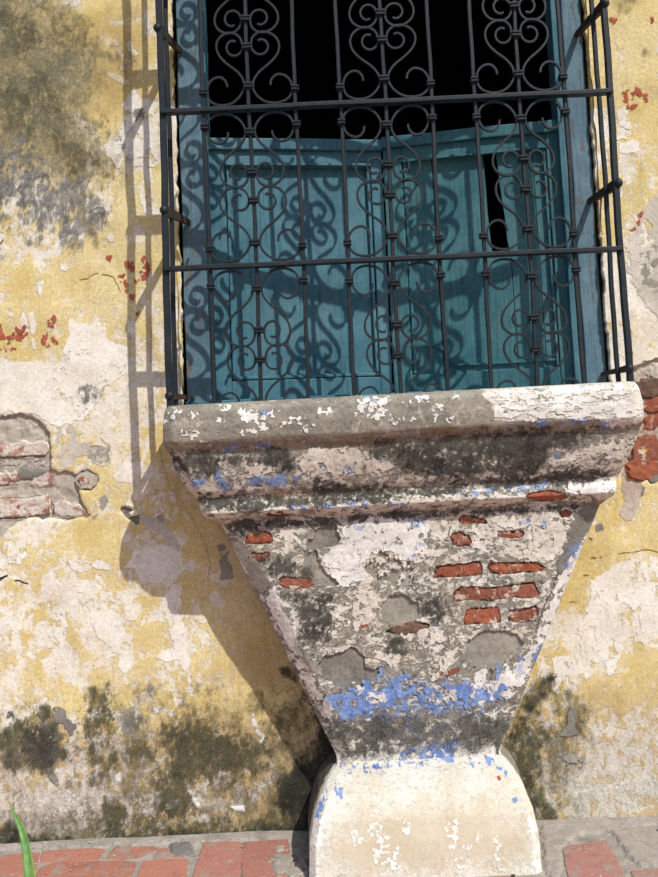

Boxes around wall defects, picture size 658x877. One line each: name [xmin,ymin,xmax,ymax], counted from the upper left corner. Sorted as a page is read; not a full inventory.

damp [0,0,126,253]
peeling [139,193,161,215]
peeling [117,255,150,301]
peeling [164,407,200,440]
damp [168,445,296,479]
damp [197,423,613,536]
peeling [0,312,193,697]
damp [257,553,340,648]
flaking render [52,707,79,736]
peeling [250,711,269,750]
damp [0,675,658,844]
peeling [340,740,508,781]